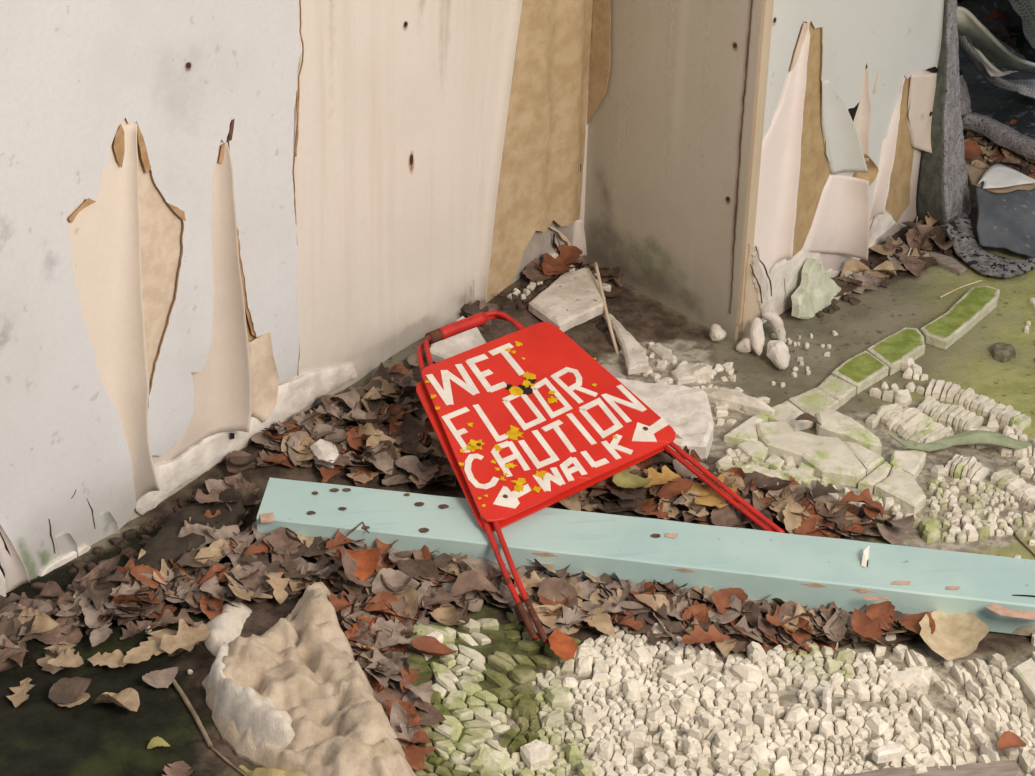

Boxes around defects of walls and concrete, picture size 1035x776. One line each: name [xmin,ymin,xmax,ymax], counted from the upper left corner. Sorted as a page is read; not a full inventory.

peeling [0,119,358,597]
spalling [513,219,587,283]
peeling [739,22,938,340]
crack [0,532,11,578]